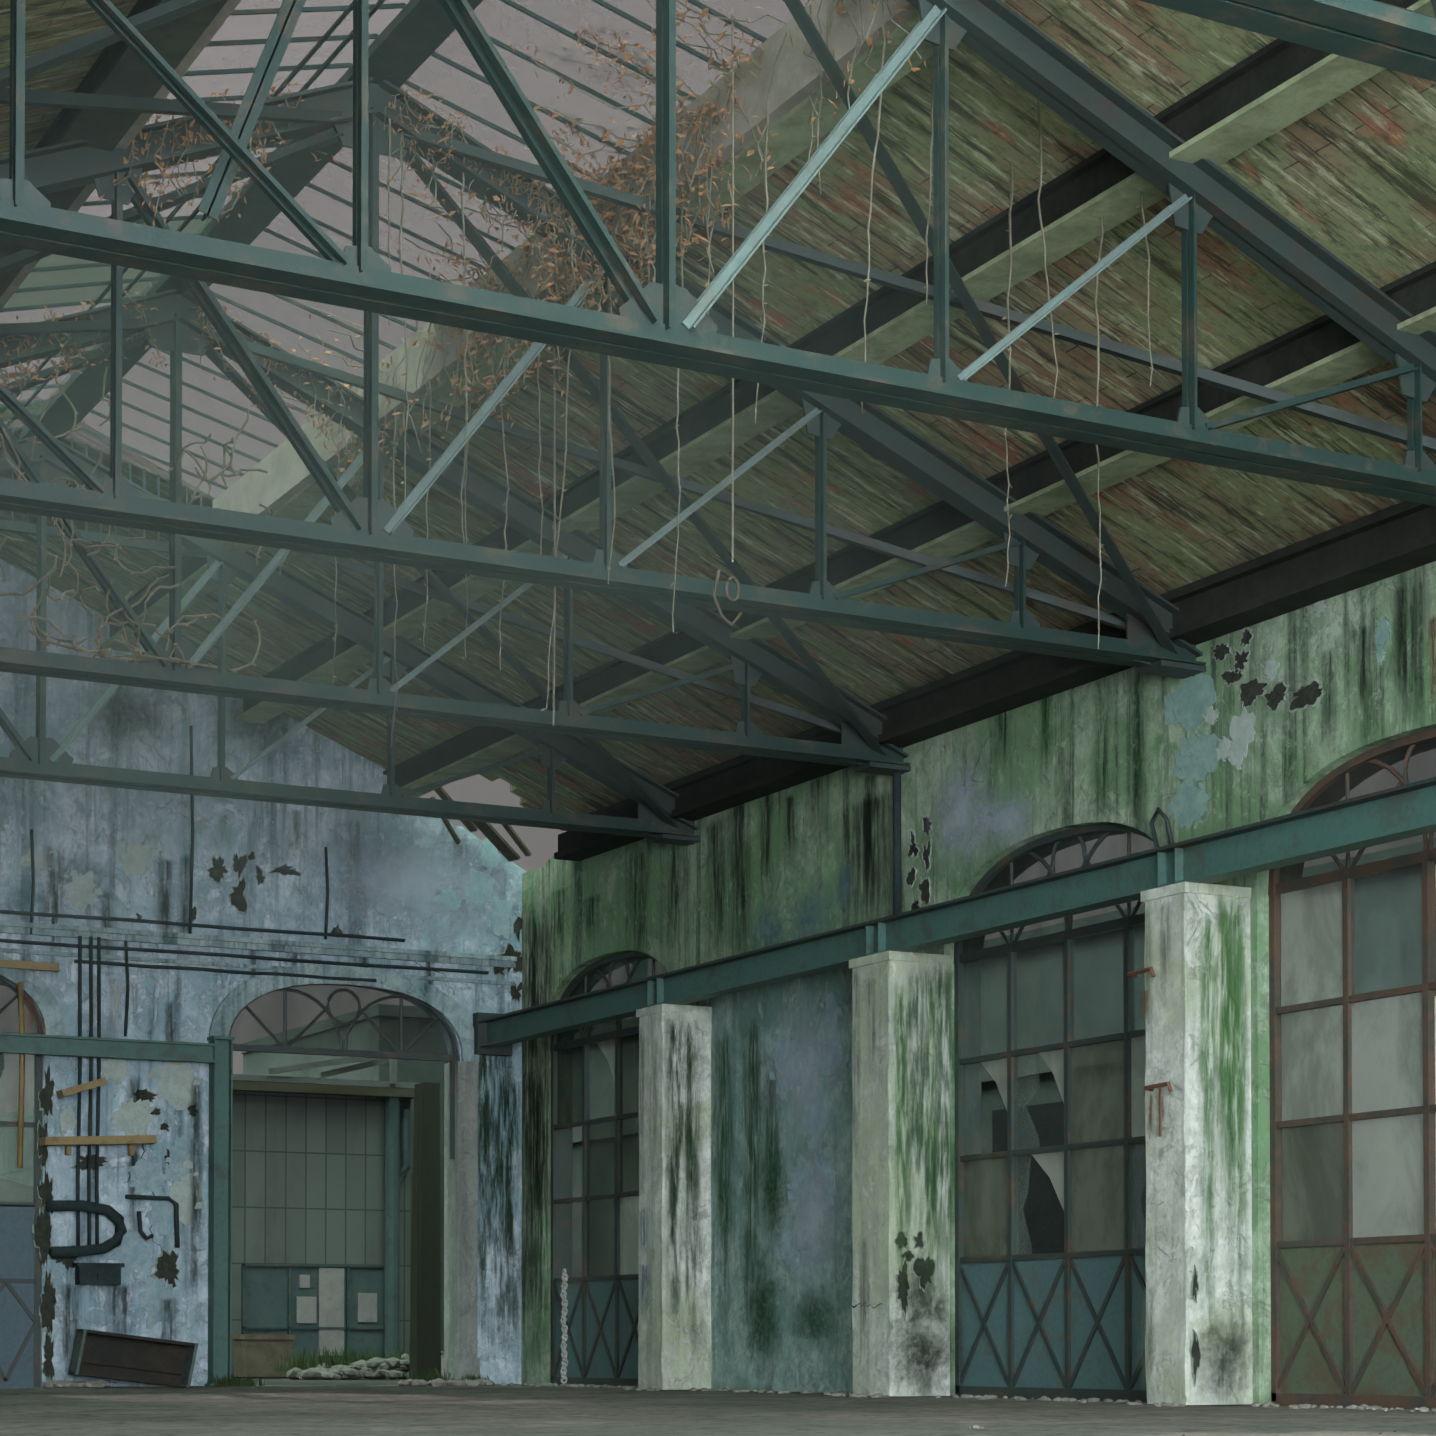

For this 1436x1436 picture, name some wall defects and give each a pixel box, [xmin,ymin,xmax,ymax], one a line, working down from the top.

peeling [1163,627,1326,829]
peeling [1313,600,1328,618]
water stain [1396,587,1418,694]
flaking render [206,851,301,915]
water stain [841,775,886,899]
flaking render [71,1153,109,1172]
peeling [101,1058,205,1330]
water stain [478,1035,552,1312]
water stain [668,1025,700,1300]
spalling [893,1230,936,1322]
water stain [896,974,957,1243]
water stain [1201,903,1246,1208]